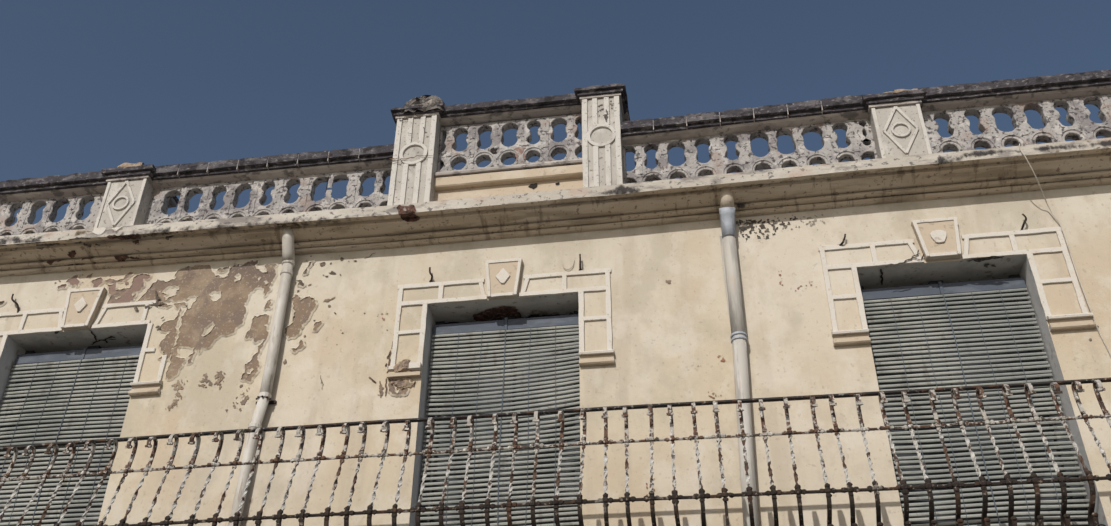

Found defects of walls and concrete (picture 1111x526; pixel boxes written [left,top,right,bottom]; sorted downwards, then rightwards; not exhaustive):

leakage [736,203,834,241]
peeling [46,226,357,412]
spalling [379,378,412,397]